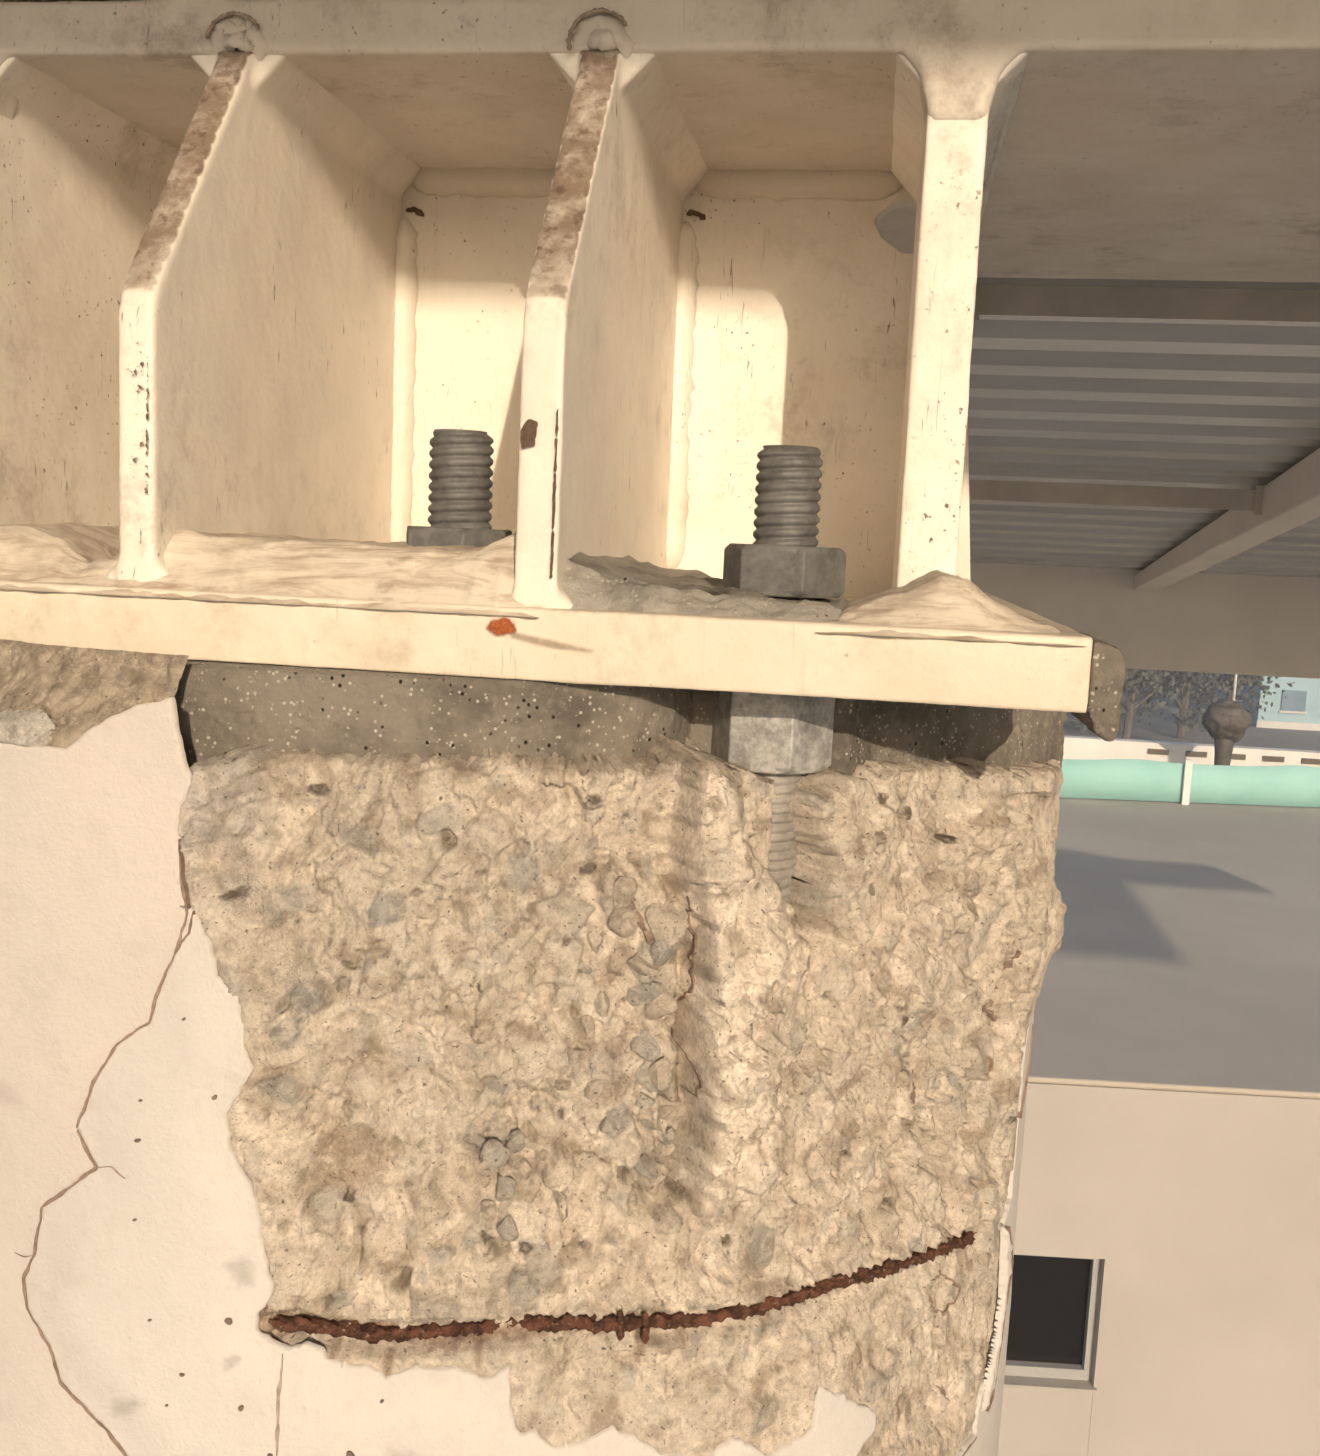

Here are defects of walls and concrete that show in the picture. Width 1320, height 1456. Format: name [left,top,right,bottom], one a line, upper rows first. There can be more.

rust [487,617,564,647]
spalling [0,639,189,748]
crack [14,839,196,1456]
spalling [177,734,1067,1456]
crack [275,1353,283,1456]